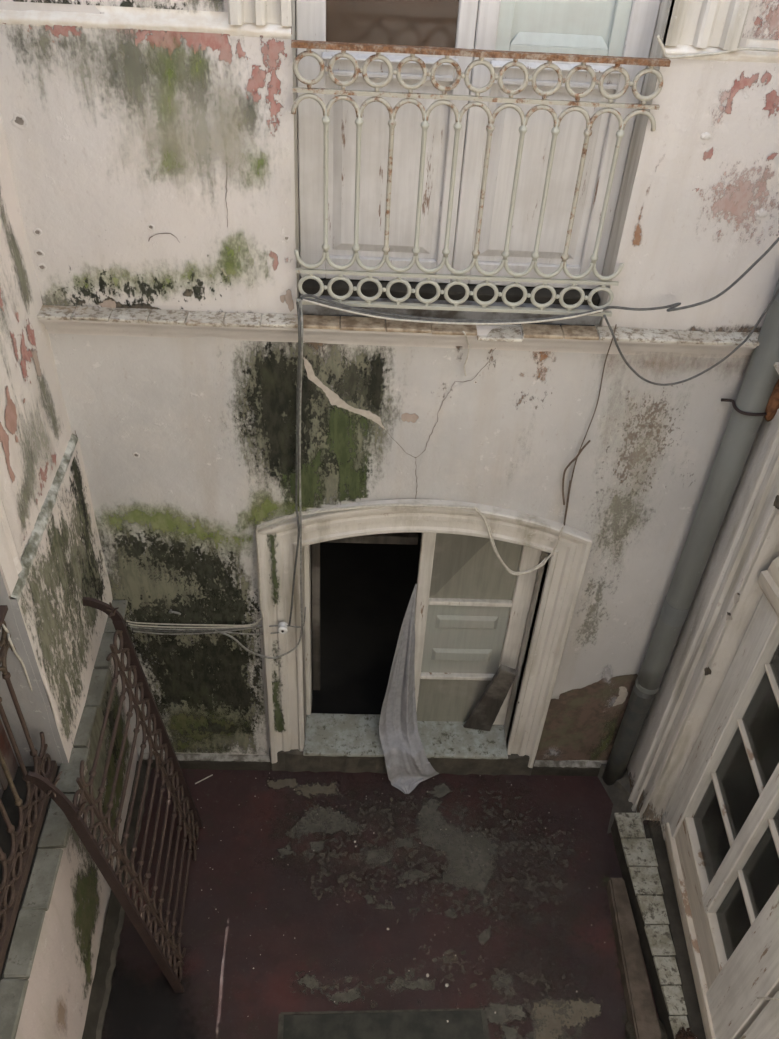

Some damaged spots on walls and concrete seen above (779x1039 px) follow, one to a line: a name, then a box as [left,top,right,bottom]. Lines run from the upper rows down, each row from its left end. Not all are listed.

leakage [75,29,257,179]
peeling [116,29,287,136]
peeling [712,71,779,122]
leakage [1,206,248,309]
peeling [692,153,779,243]
peeling [10,312,42,383]
peeling [0,386,25,483]
leakage [234,342,394,526]
crack [303,348,496,497]
leakage [599,385,686,555]
leakage [21,455,286,754]
peeling [266,778,603,1039]